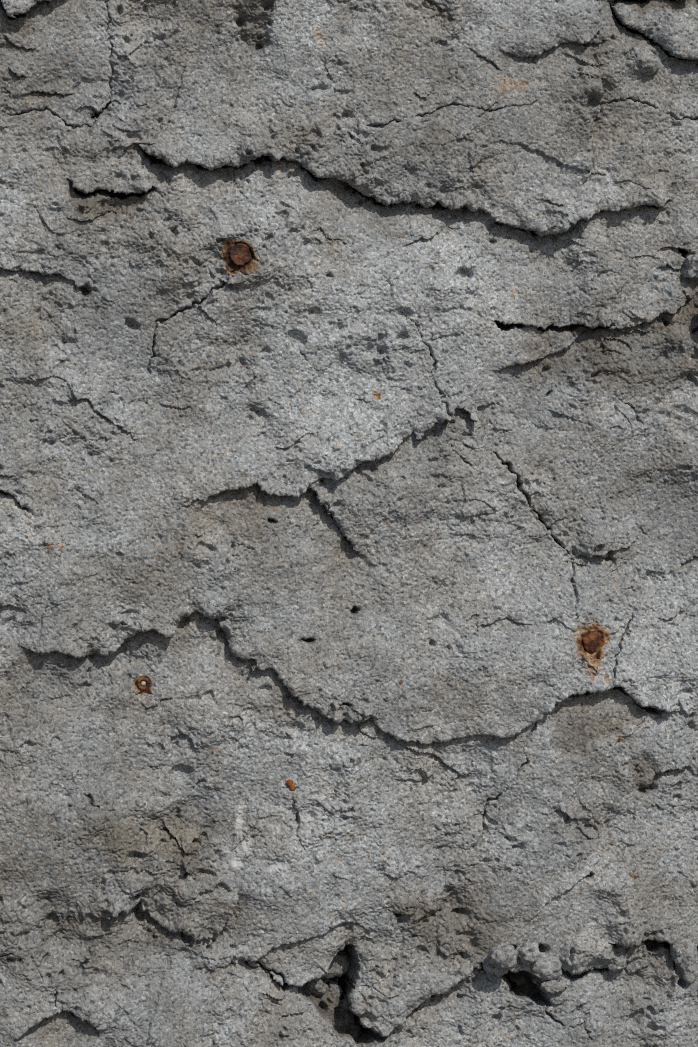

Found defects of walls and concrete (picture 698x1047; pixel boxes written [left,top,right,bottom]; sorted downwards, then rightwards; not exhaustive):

crack [10,0,132,130]
crack [368,100,538,128]
crack [600,98,698,121]
corrosion [220,238,261,276]
crack [148,269,255,373]
crack [326,504,351,543]
corrosion [570,619,613,688]
crack [612,615,634,688]
corrosion [134,672,156,698]
spalling [33,886,550,1047]
peeling [560,927,698,982]